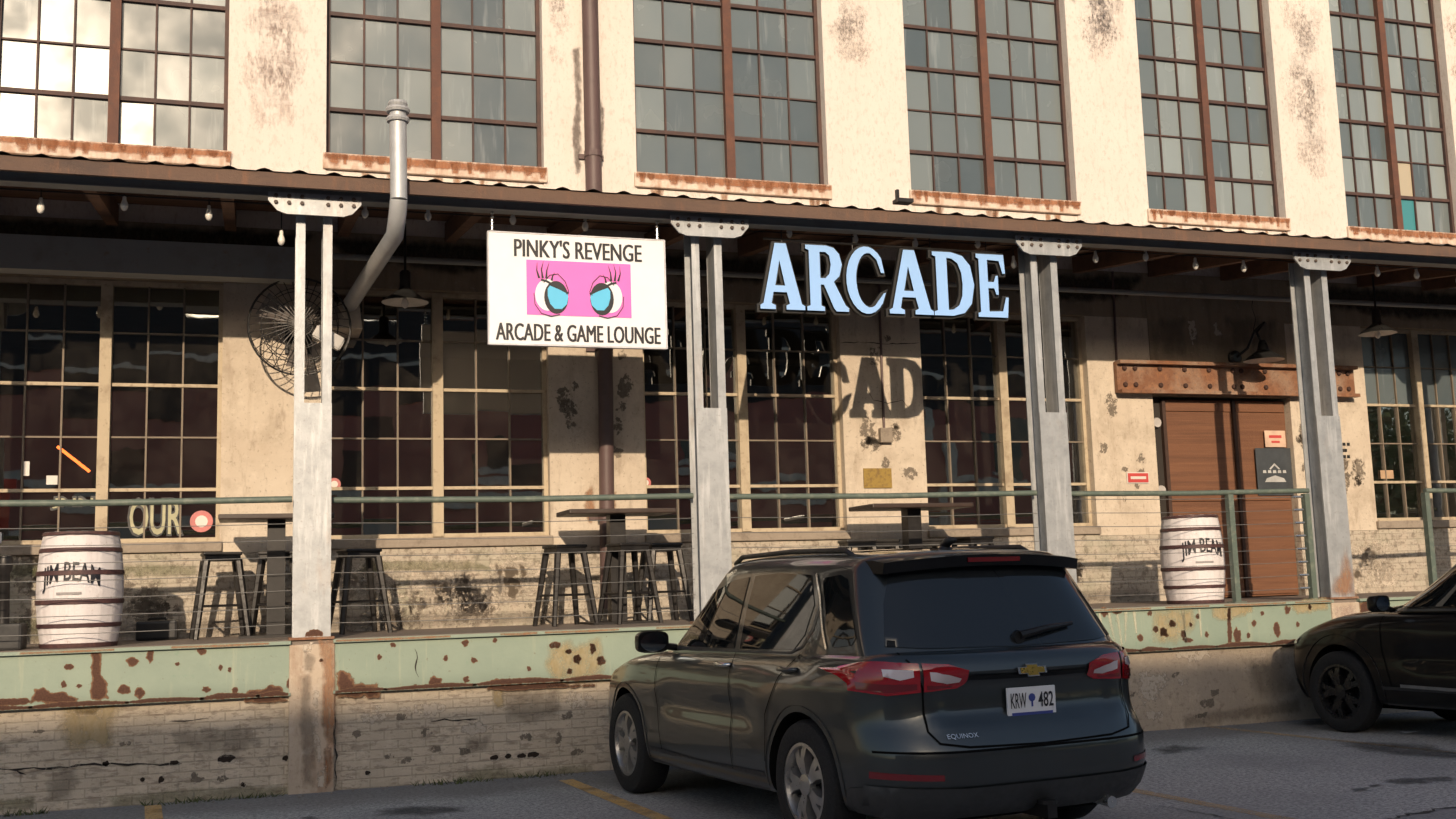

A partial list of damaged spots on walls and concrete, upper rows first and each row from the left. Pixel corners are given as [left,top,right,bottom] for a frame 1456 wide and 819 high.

rust [0,137,232,162]
rust [325,154,546,184]
rust [912,191,1081,220]
rust [1150,210,1290,234]
rust [1350,227,1456,240]
peeling [1343,458,1366,494]